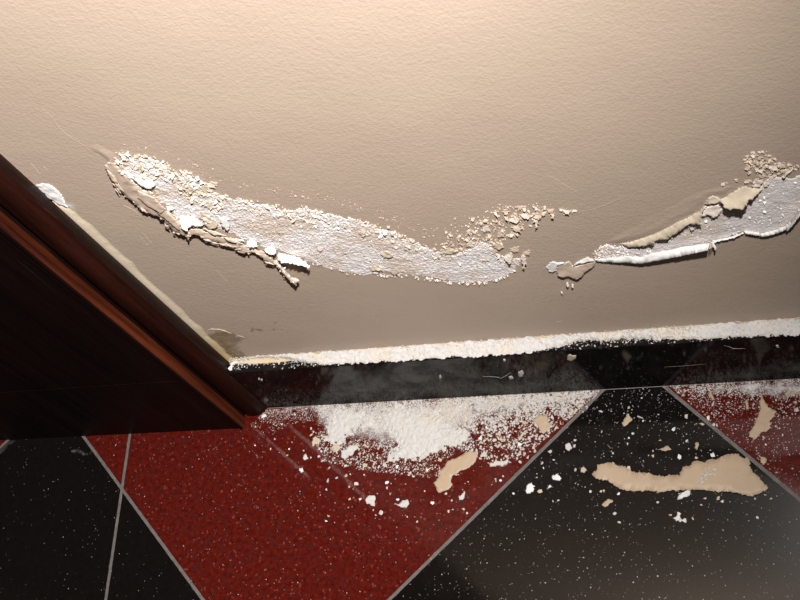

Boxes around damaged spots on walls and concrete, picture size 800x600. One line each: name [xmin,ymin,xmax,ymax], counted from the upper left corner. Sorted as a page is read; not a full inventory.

spalling [36,183,74,210]
spalling [105,144,521,286]
peeling [546,175,800,294]